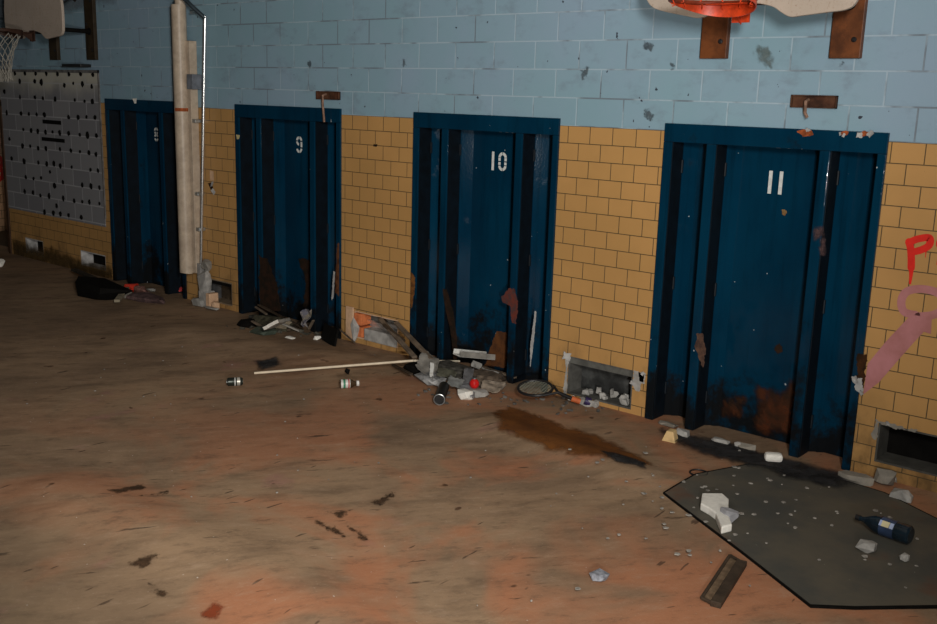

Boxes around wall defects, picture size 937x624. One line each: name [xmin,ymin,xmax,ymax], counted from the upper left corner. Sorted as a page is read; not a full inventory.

corrosion [501,288,518,324]
corrosion [694,333,706,367]
corrosion [755,383,796,434]